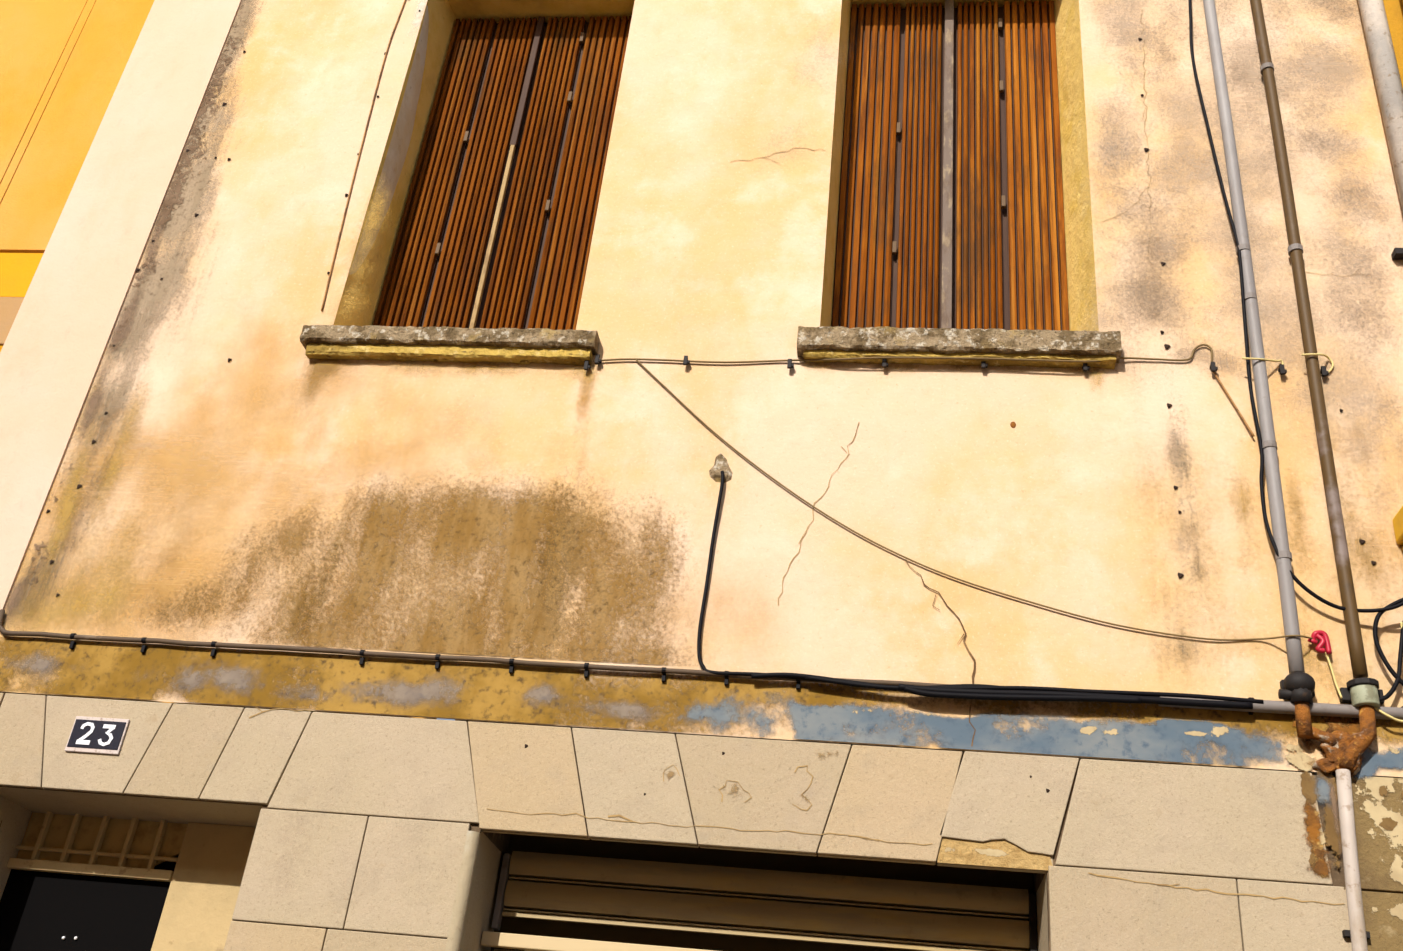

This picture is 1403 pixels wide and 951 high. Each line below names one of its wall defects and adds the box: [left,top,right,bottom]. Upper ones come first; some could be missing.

water stain [0,470,1356,740]
crack [778,422,859,605]
crack [905,559,976,746]
peeling [687,697,1403,885]
corrosion [1303,804,1331,877]
corrosion [1293,716,1363,777]
water stain [1374,719,1403,743]